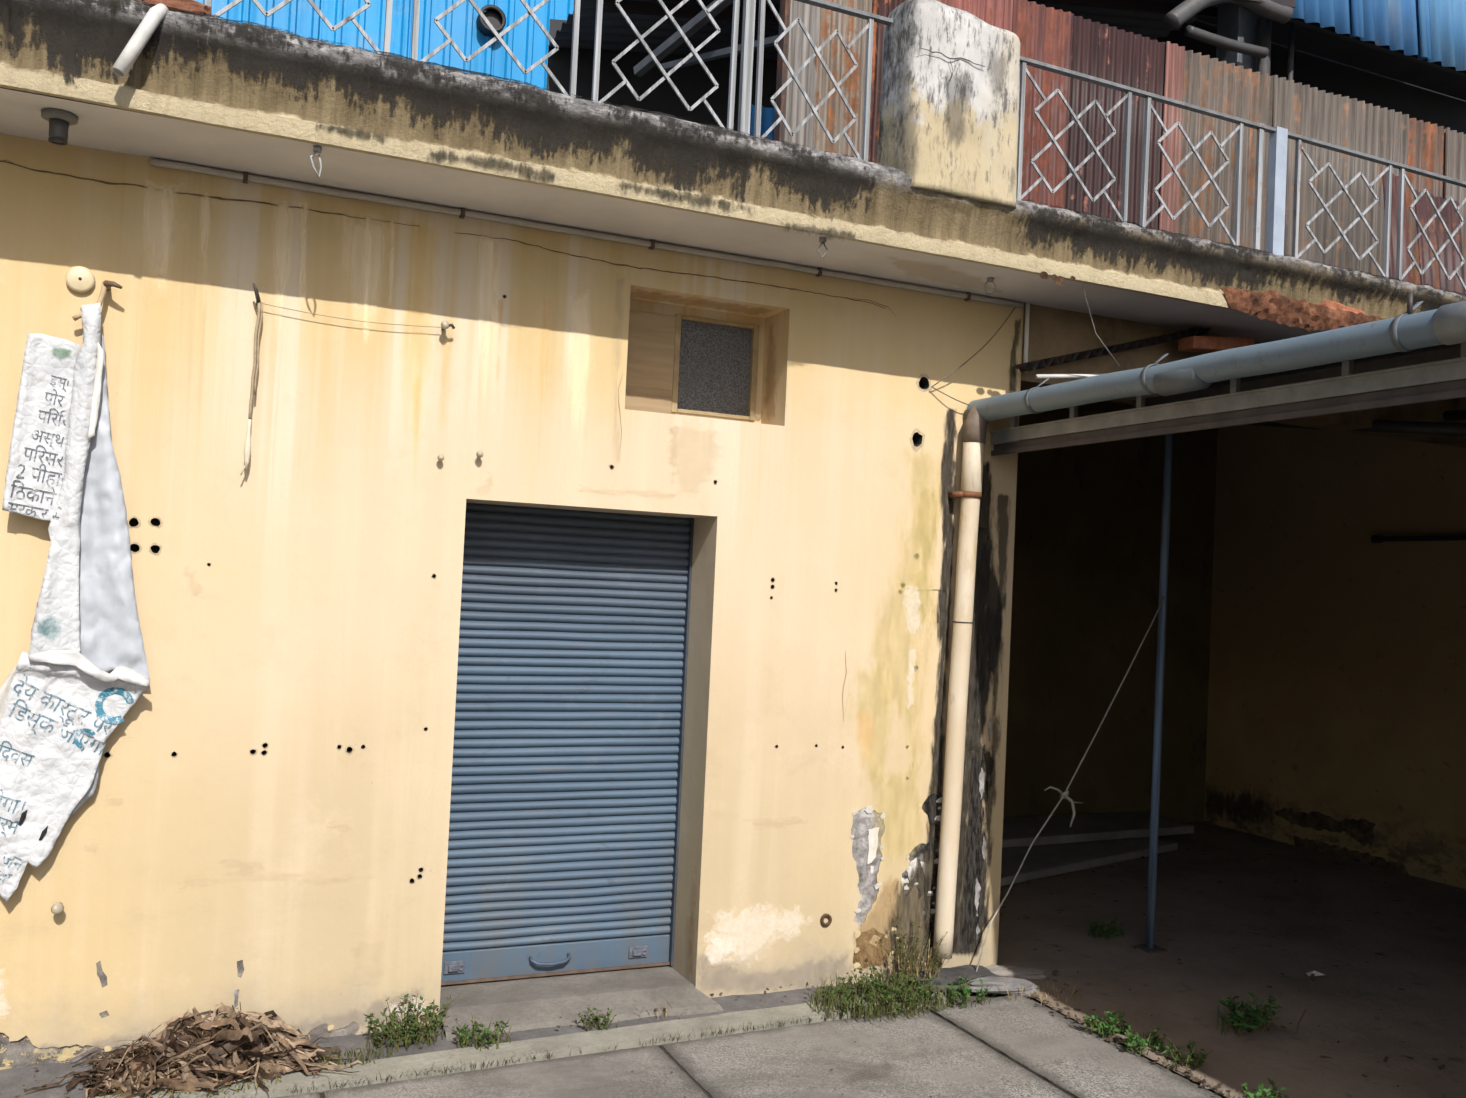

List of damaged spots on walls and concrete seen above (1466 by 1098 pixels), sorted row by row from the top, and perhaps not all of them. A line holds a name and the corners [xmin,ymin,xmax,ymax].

damp [320,125,384,143]
mould [431,150,554,182]
crack [0,160,420,227]
mould [621,182,750,211]
damp [785,224,855,239]
damp [889,409,957,964]
damp [952,462,1009,955]
spalling [922,796,943,824]
peeling [851,805,899,969]
peeling [901,843,939,916]
spalling [0,1033,118,1070]